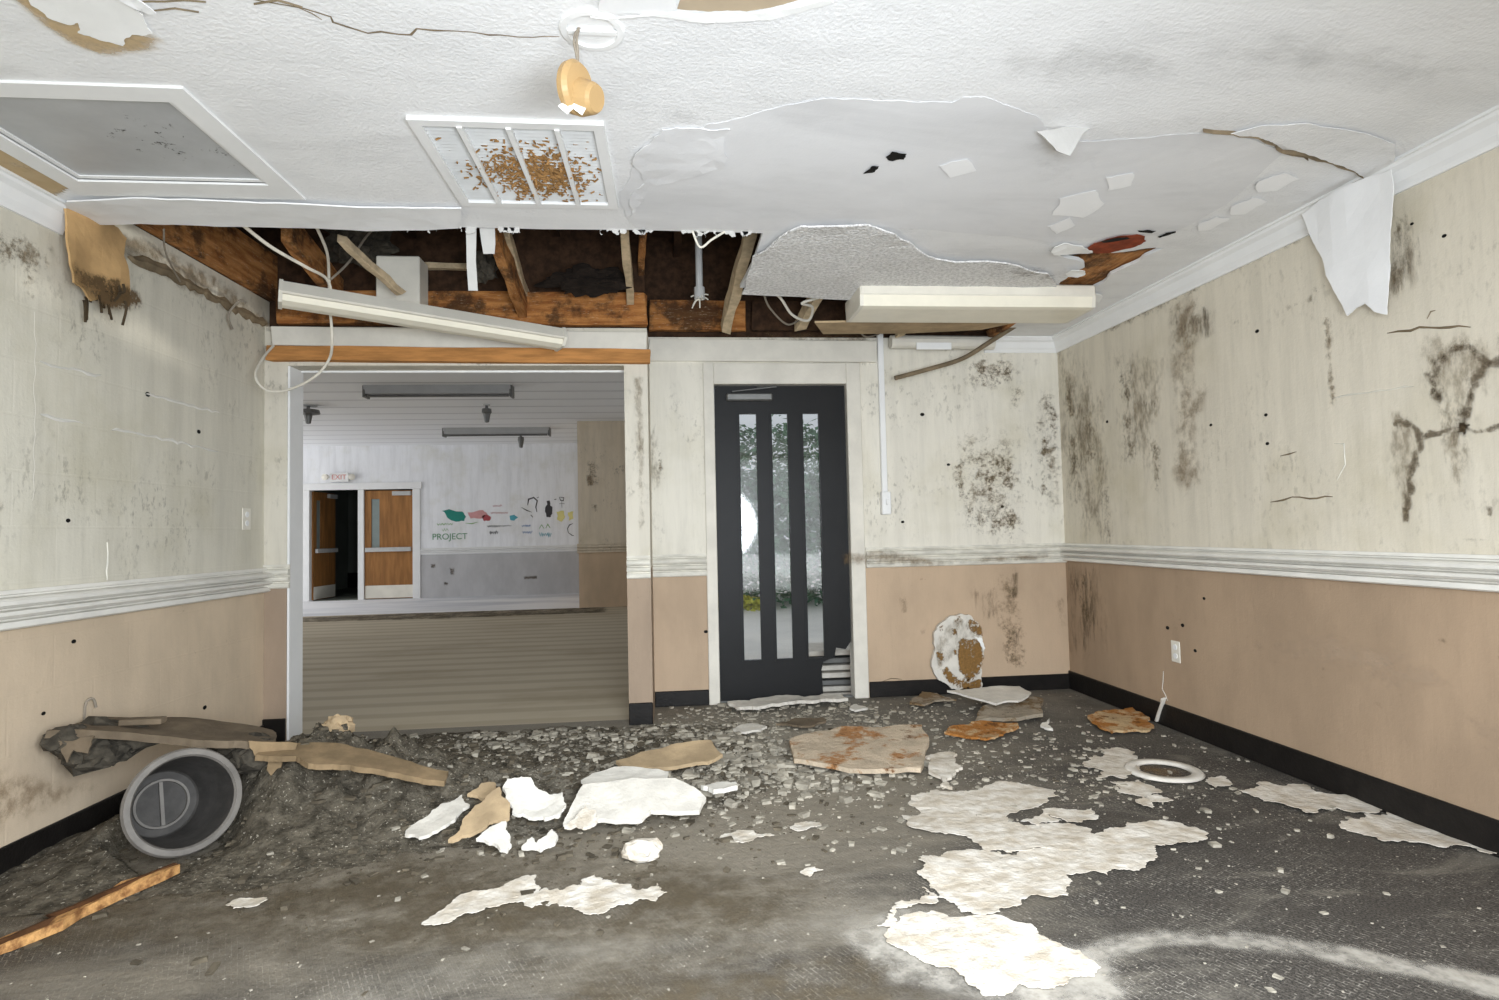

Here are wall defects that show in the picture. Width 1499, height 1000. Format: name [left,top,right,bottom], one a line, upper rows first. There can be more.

peeling [29,0,156,46]
crack [254,0,559,38]
peeling [590,0,834,24]
flaking render [619,97,1395,316]
peeling [64,197,461,326]
water stain [1426,346,1499,432]
water stain [958,454,1014,526]
water stain [1395,420,1445,521]